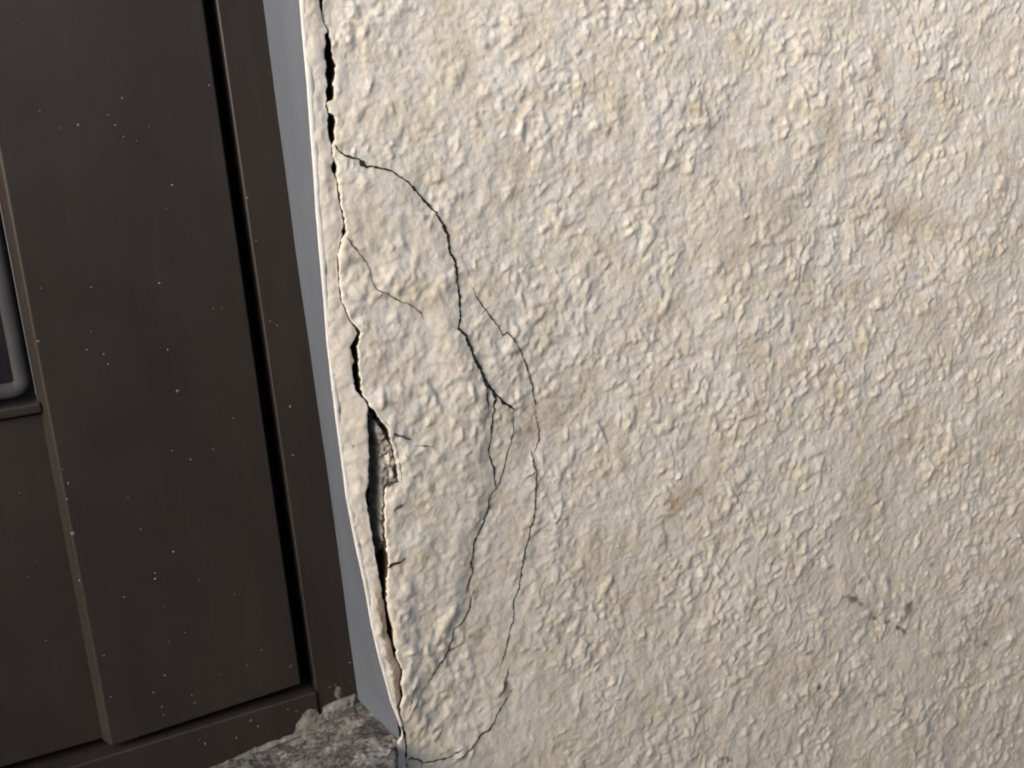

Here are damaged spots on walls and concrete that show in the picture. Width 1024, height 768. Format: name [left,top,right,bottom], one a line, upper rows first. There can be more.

crack [324,49,540,766]